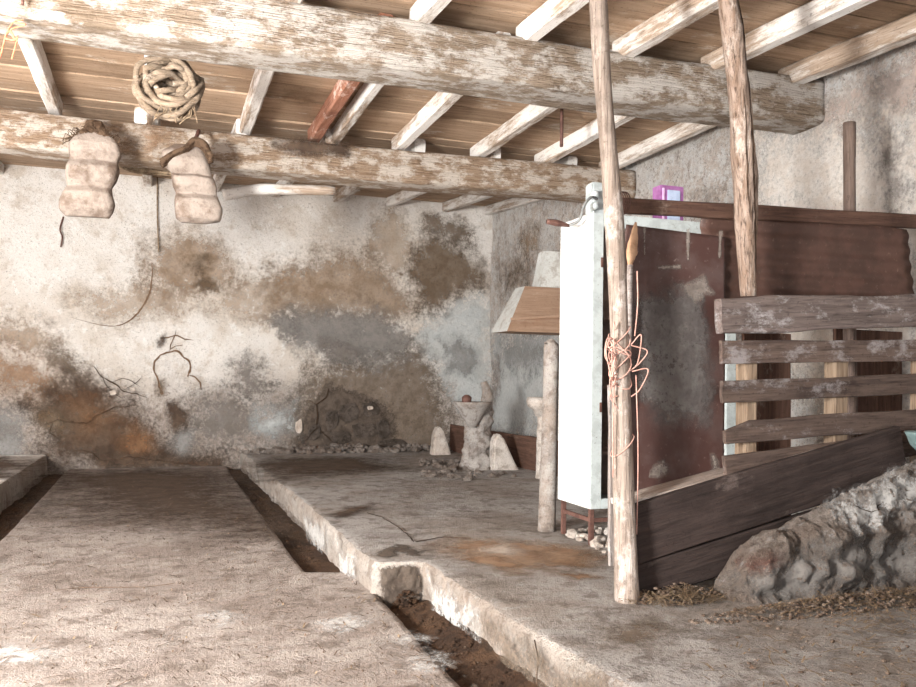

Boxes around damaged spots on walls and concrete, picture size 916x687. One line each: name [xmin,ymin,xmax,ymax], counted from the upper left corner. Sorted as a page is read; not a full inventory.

leakage [883,147,903,212]
leakage [77,207,489,339]
leakage [500,224,540,292]
crack [48,332,201,438]
leakage [443,339,477,374]
leakage [0,338,450,548]